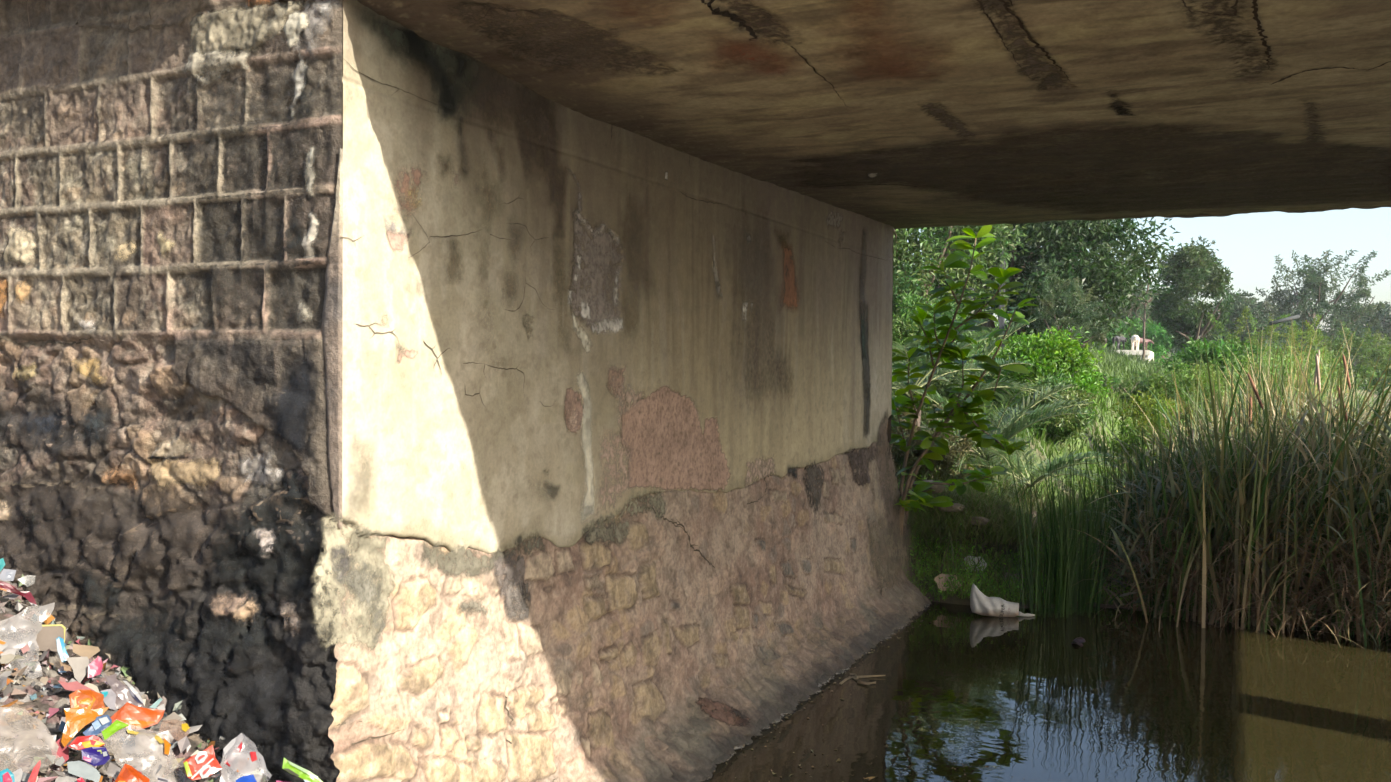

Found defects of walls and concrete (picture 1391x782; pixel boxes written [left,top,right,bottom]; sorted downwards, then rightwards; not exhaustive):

crack [701,0,758,41]
crack [977,0,1070,81]
crack [1182,0,1391,85]
peeling [387,168,421,251]
leakage [364,14,648,352]
crack [408,195,553,312]
crack [357,323,556,407]
peeling [565,388,583,433]
leakage [578,373,594,518]
peeling [583,385,774,545]
leakage [788,461,824,512]
leakage [848,231,920,592]